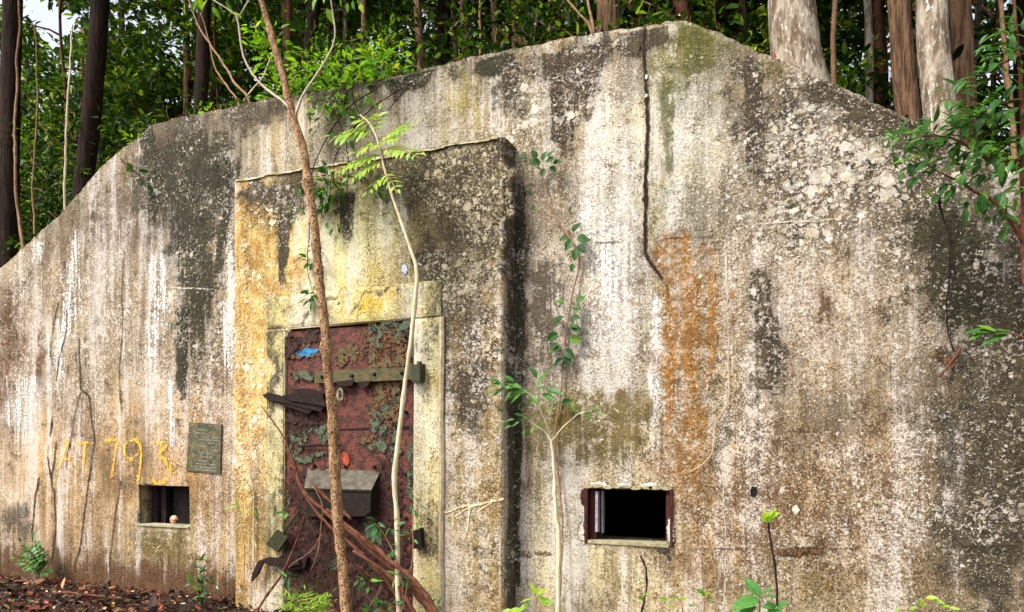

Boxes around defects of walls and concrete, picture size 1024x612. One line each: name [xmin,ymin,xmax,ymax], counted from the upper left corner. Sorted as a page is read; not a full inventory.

crack [31,303,122,573]
leakage [139,127,316,450]
leakage [377,140,564,588]
leakage [475,26,668,162]
crack [639,25,669,298]
corrosion [651,228,734,503]